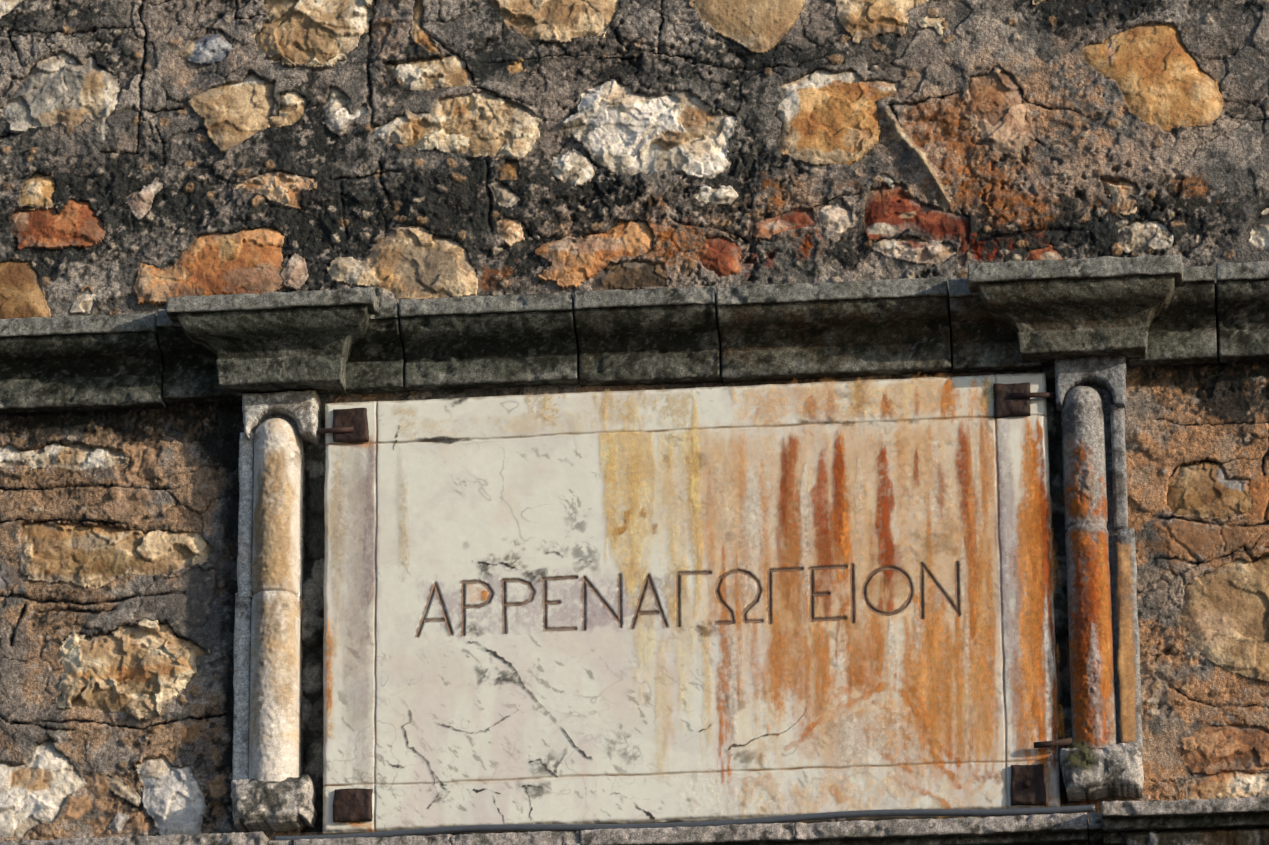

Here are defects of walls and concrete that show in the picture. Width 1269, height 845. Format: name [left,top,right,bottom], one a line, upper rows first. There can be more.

crack [7,0,184,161]
rust [941,379,955,415]
spalling [114,439,156,517]
crack [1151,418,1269,565]
crack [0,591,189,646]
rust [717,546,741,781]
rust [764,428,998,808]
rust [1011,421,1136,807]
peeling [66,773,150,834]
crack [0,713,226,731]
peeling [207,749,227,815]
crack [390,710,592,821]